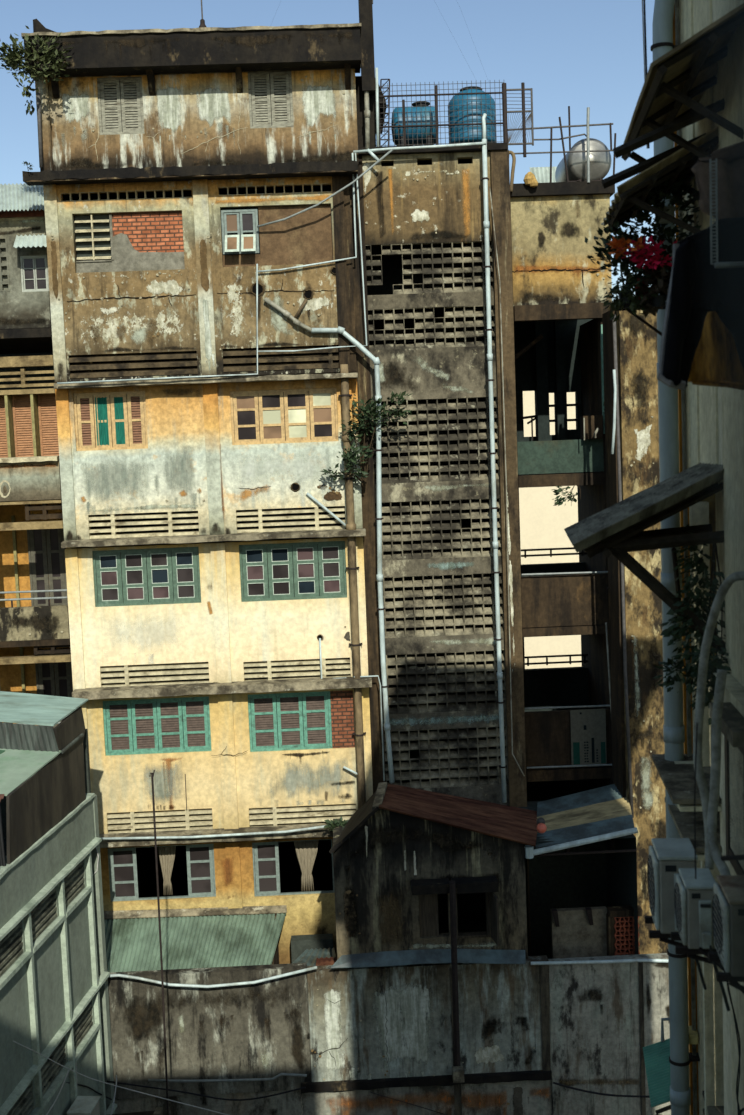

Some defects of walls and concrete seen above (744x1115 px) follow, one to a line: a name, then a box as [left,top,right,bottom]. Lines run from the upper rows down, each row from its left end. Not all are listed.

water stain [284,152,352,162]
peeling [407,204,437,234]
water stain [561,223,579,237]
peeling [51,235,196,351]
peeling [139,233,212,299]
peeling [220,281,332,350]
water stain [523,293,558,301]
water stain [632,374,647,407]
water stain [85,453,196,509]
water stain [12,616,63,638]
water stain [124,994,191,1054]
water stain [287,1009,304,1069]